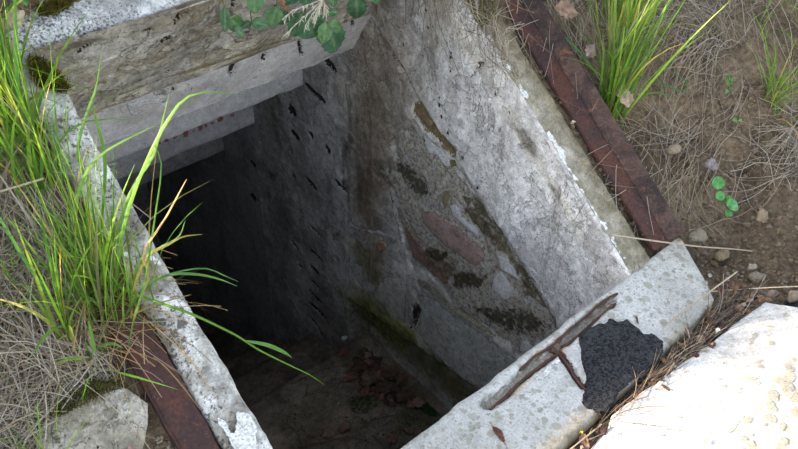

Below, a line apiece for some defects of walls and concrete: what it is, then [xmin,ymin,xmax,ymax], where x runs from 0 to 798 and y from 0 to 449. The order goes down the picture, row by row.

flaking render [376,127,626,410]
peeling [217,412,259,449]